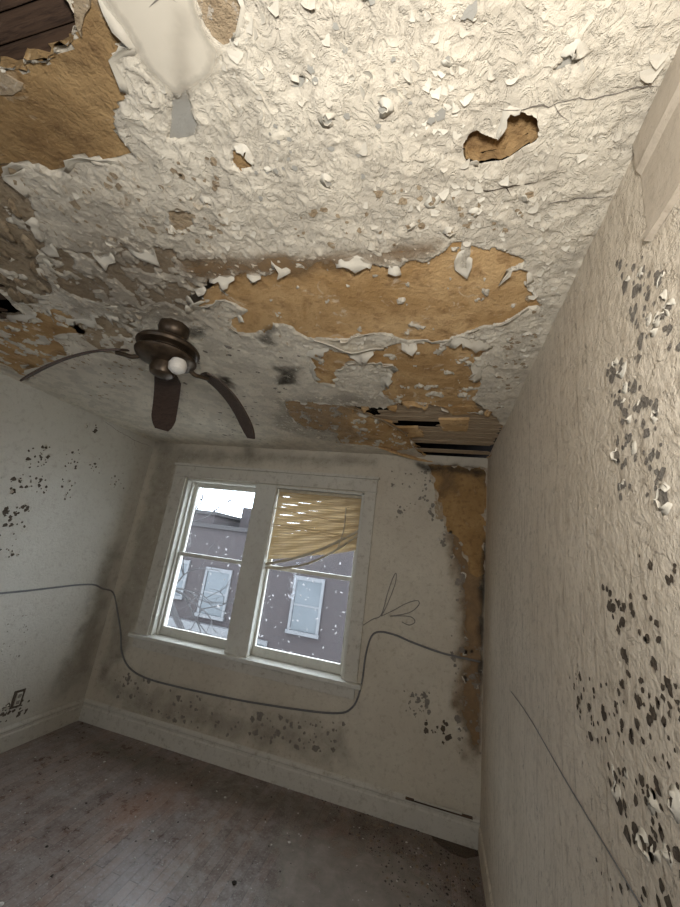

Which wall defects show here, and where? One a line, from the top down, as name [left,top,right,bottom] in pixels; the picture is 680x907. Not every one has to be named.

spalling [555,39,593,73]
peeling [637,52,670,83]
flaking render [0,0,567,601]
damp [417,463,486,495]
damp [449,534,485,752]
mould [404,690,452,745]